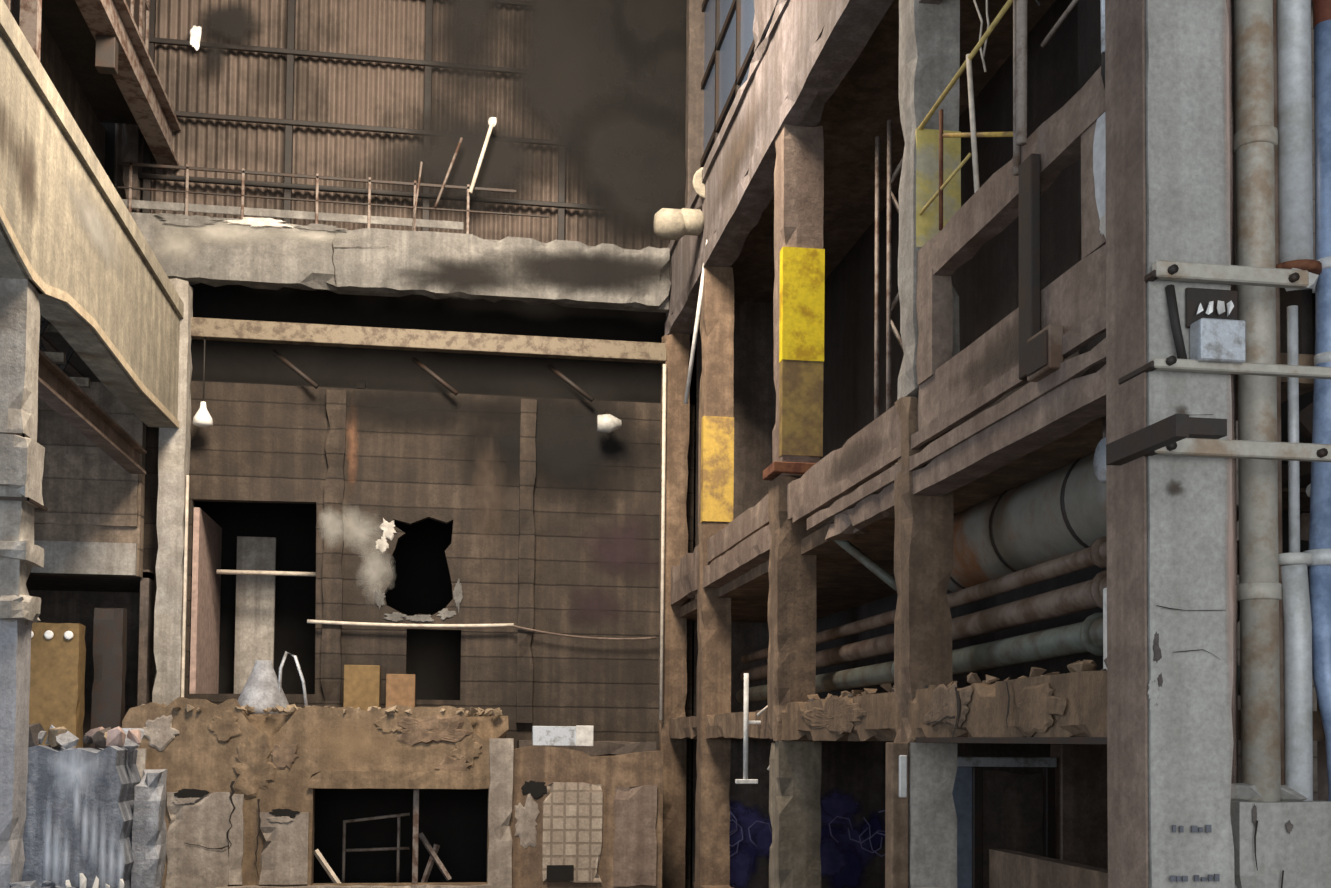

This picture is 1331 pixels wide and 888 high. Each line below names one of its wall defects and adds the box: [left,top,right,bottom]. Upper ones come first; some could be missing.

leakage [617,0,687,59]
leakage [578,104,686,227]
leakage [417,261,504,291]
peeling [323,512,463,623]
spalling [142,715,180,751]
spalling [207,710,299,800]
spalling [800,696,867,735]
spalling [924,681,973,727]
spalling [1017,682,1066,737]
crack [185,781,261,879]
spalling [267,809,300,823]